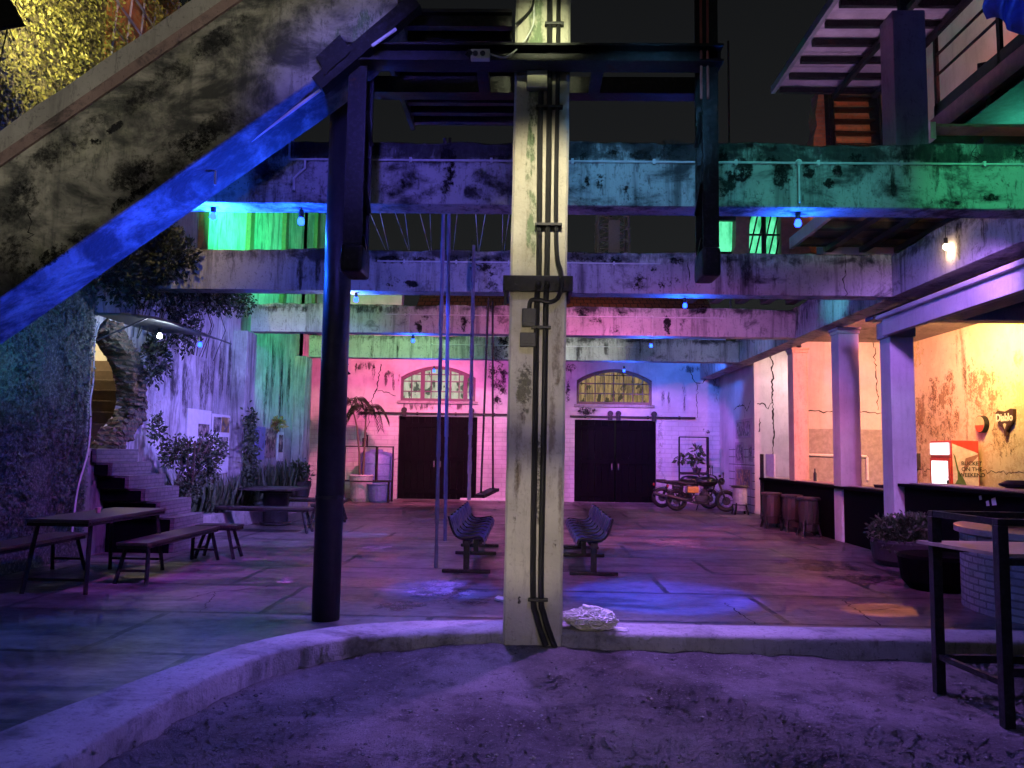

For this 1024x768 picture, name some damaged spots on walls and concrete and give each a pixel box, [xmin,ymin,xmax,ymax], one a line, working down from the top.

damp [196,15,248,56]
damp [0,62,190,222]
damp [109,112,234,214]
damp [425,140,496,199]
damp [719,148,872,197]
damp [0,232,91,278]
damp [297,257,321,289]
damp [264,339,291,423]
crack [366,364,395,435]
crack [734,356,775,451]
crack [862,343,880,414]
peeling [915,373,959,451]